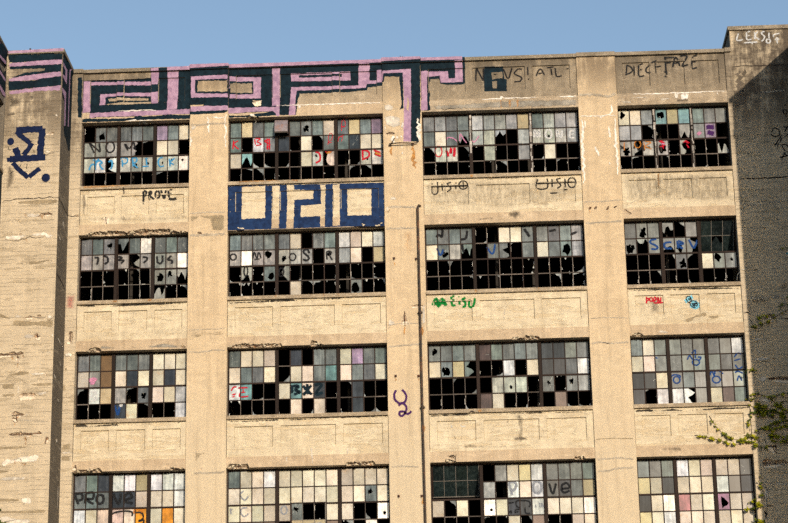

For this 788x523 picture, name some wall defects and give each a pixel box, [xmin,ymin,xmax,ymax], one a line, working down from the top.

crack [740,173,787,181]
peeling [0,314,53,340]
peeling [0,351,56,401]
spalling [0,411,49,449]
spalling [762,441,788,468]
peeling [0,499,45,513]